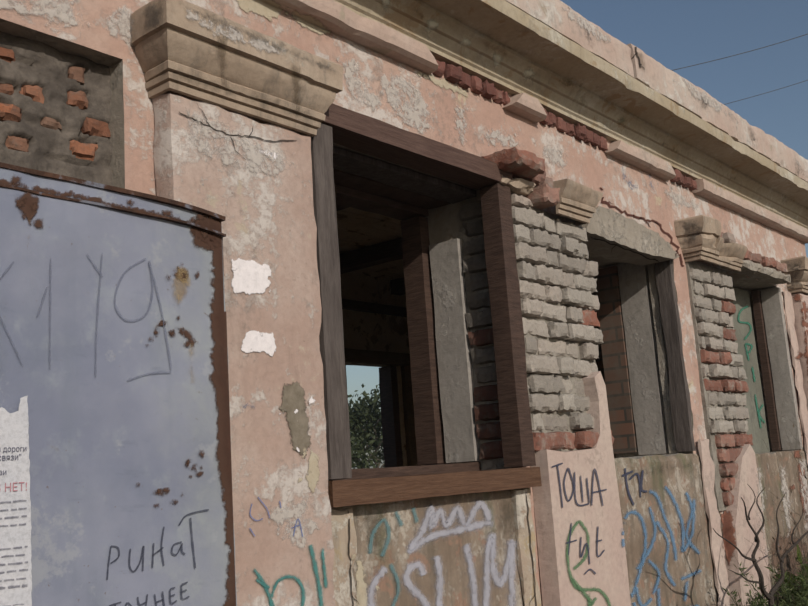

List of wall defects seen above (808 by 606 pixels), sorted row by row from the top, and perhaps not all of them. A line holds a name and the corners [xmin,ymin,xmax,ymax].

crack [179,107,297,159]
flaking render [337,56,510,134]
crack [593,238,658,261]
rust [0,176,236,606]
flaking render [279,382,320,493]